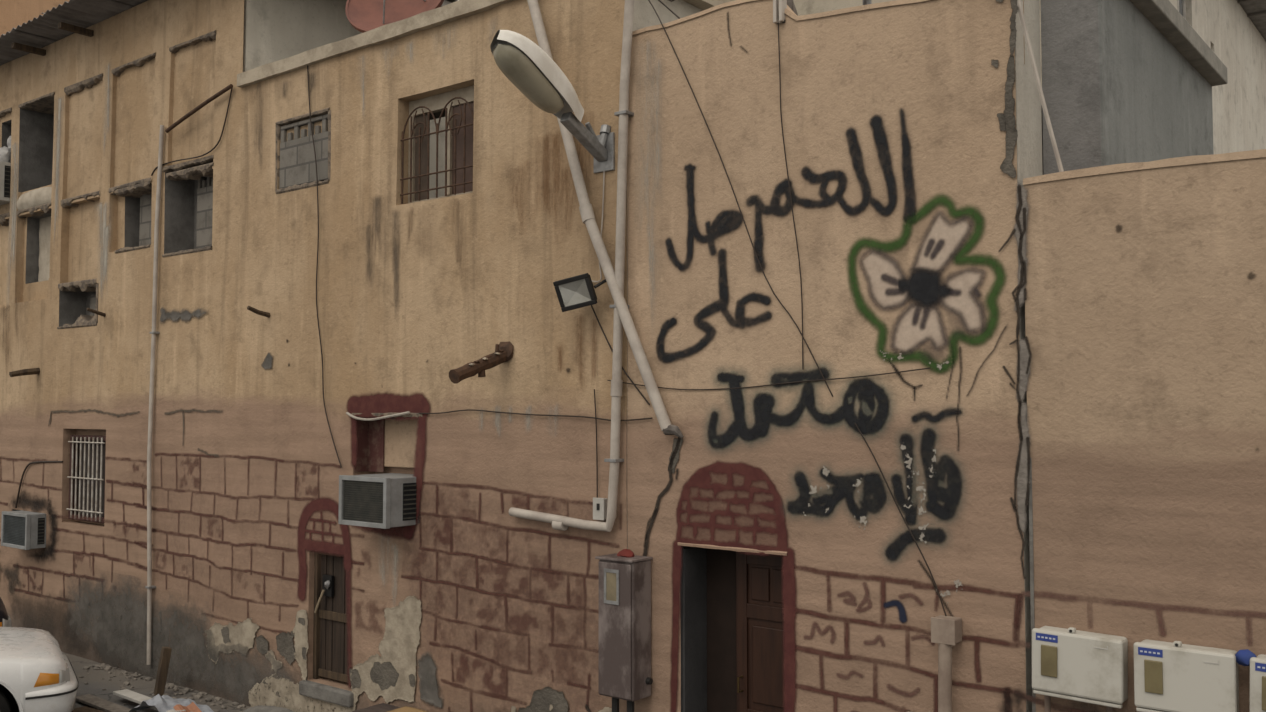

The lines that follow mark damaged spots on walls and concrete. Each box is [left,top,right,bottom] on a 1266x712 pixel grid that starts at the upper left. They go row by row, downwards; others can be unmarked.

peeling [205,596,422,712]
flaking render [511,687,568,712]